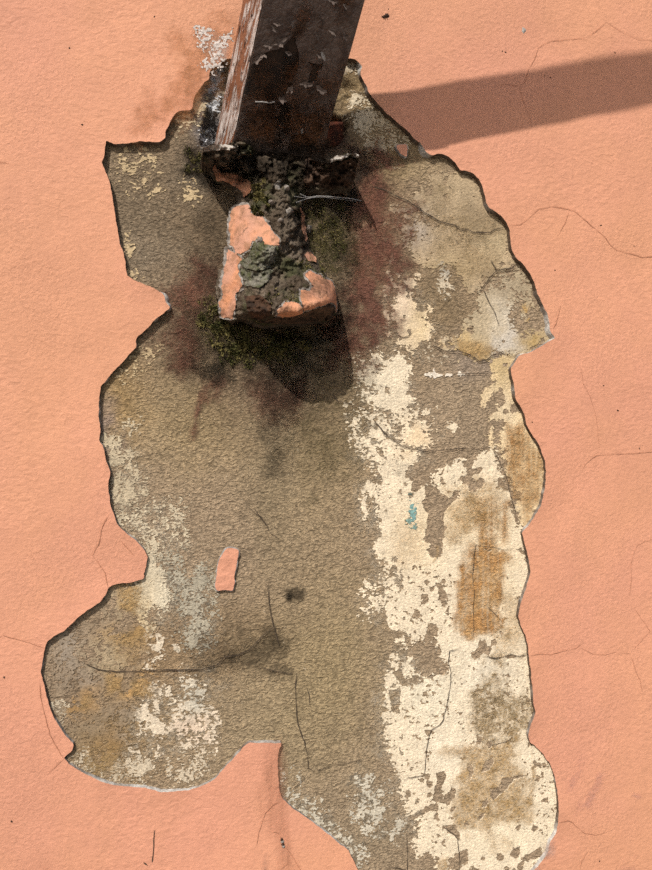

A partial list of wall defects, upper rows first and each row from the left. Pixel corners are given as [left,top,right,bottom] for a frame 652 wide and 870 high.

peeling [193,25,233,50]
leakage [297,147,418,354]
crack [370,185,652,258]
peeling [41,58,559,870]
corrosion [455,493,509,640]